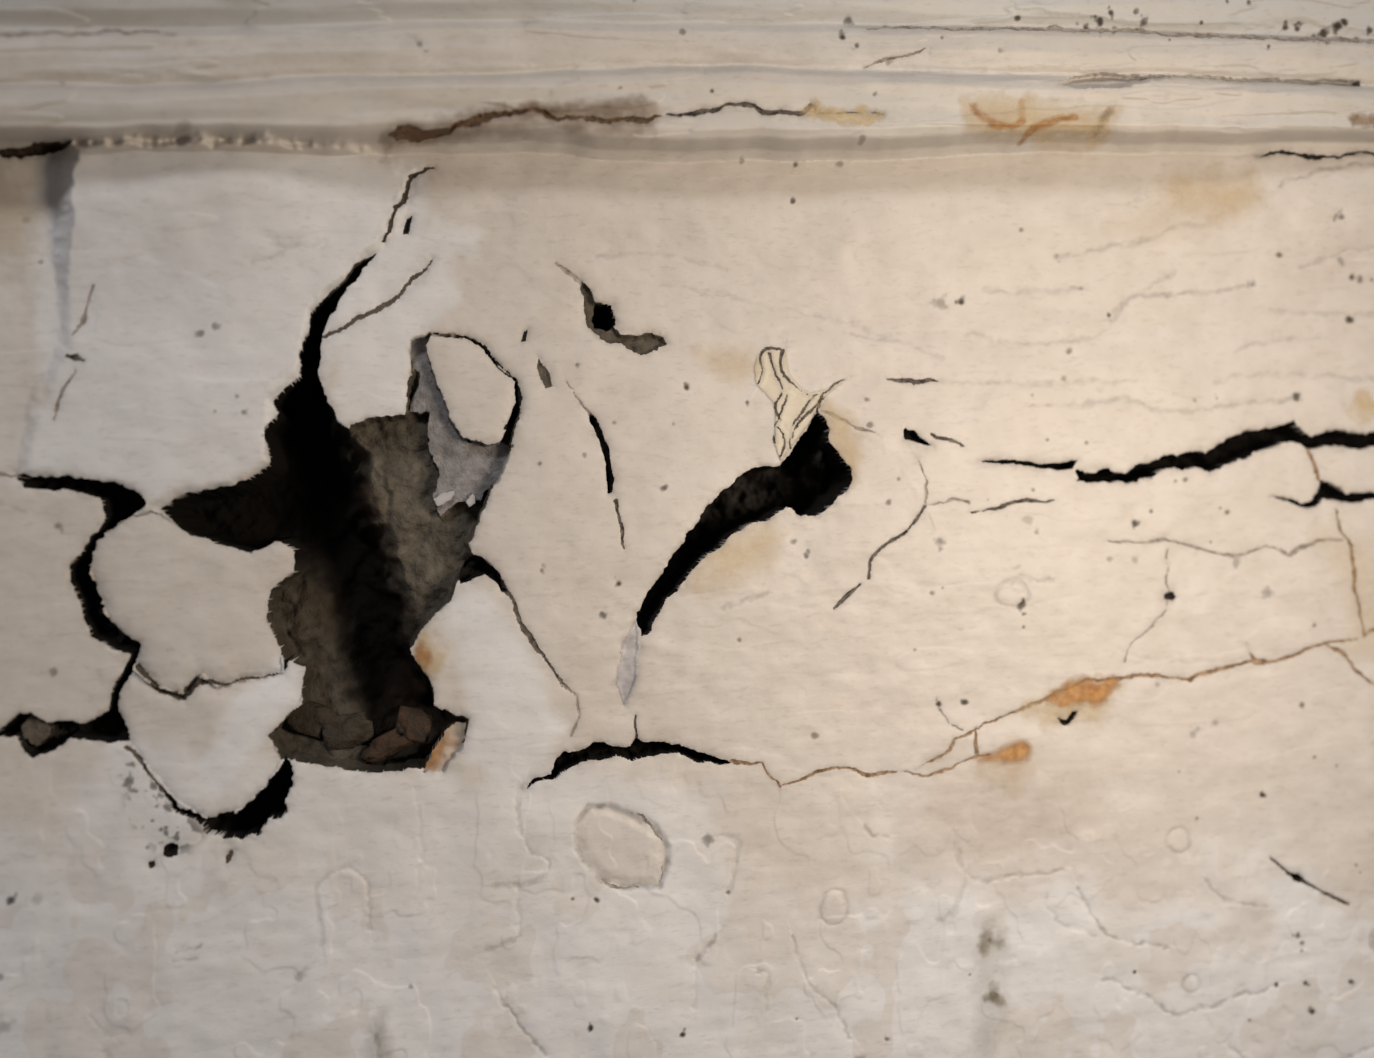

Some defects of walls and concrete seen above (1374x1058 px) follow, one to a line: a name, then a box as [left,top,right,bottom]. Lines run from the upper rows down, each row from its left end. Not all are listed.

crack [0,139,73,159]
crack [382,102,883,242]
crack [1260,150,1374,160]
crack [565,381,625,549]
spalling [0,254,580,864]
spalling [616,346,876,739]
crack [527,421,1374,789]
rust [981,742,1030,761]
rust [1048,677,1117,706]
peeling [148,842,179,868]